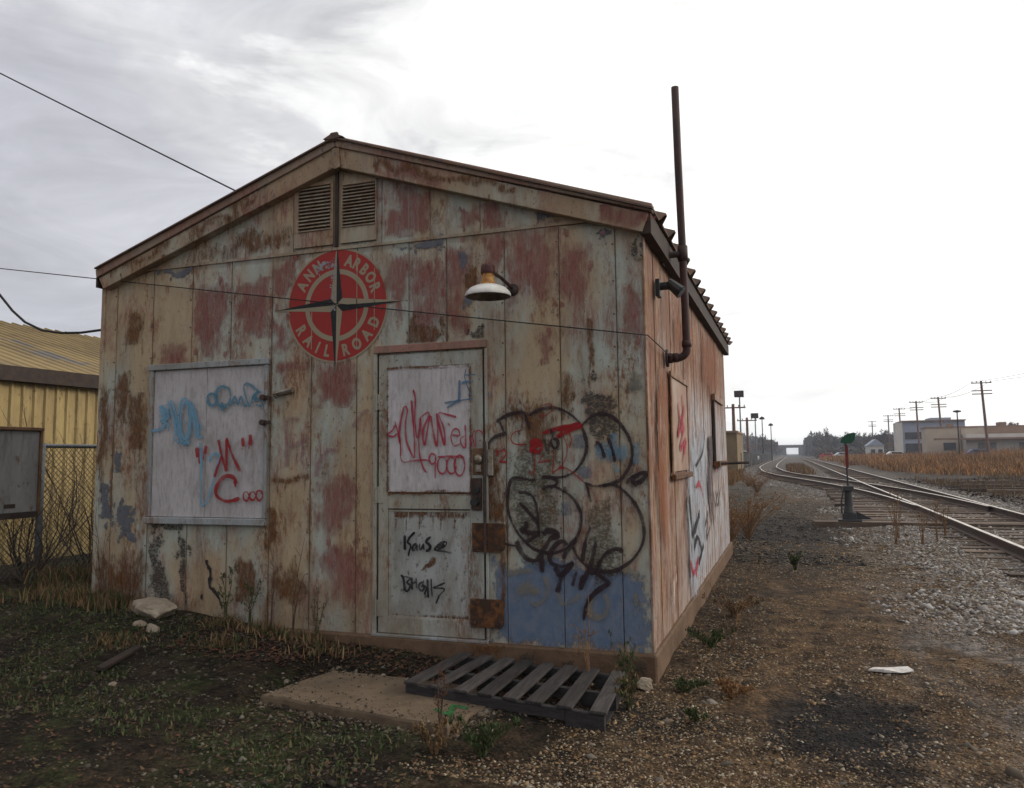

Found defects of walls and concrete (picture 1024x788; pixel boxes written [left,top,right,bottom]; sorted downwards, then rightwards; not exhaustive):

corrosion [124,310,145,354]
corrosion [670,304,697,372]
corrosion [98,370,147,488]
peeling [94,447,136,543]
corrosion [657,369,674,606]